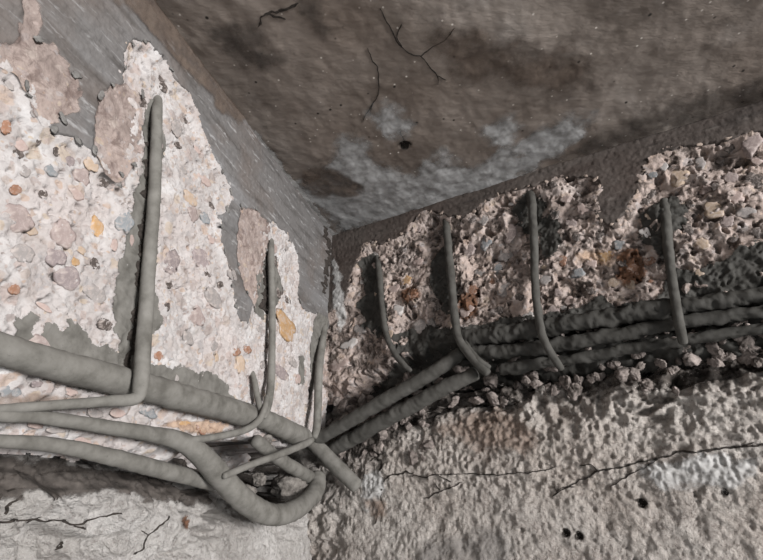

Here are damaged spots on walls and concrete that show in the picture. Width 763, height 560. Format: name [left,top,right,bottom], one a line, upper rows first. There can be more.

crack [258,3,298,27]
crack [380,9,455,81]
crack [363,50,379,120]
water stain [374,106,413,137]
water stain [254,117,585,236]
spalling [0,0,326,527]
rust [577,248,646,285]
spalling [303,130,763,492]
crack [0,467,122,530]
crack [370,451,553,524]
crack [552,442,763,497]
crack [134,516,170,555]